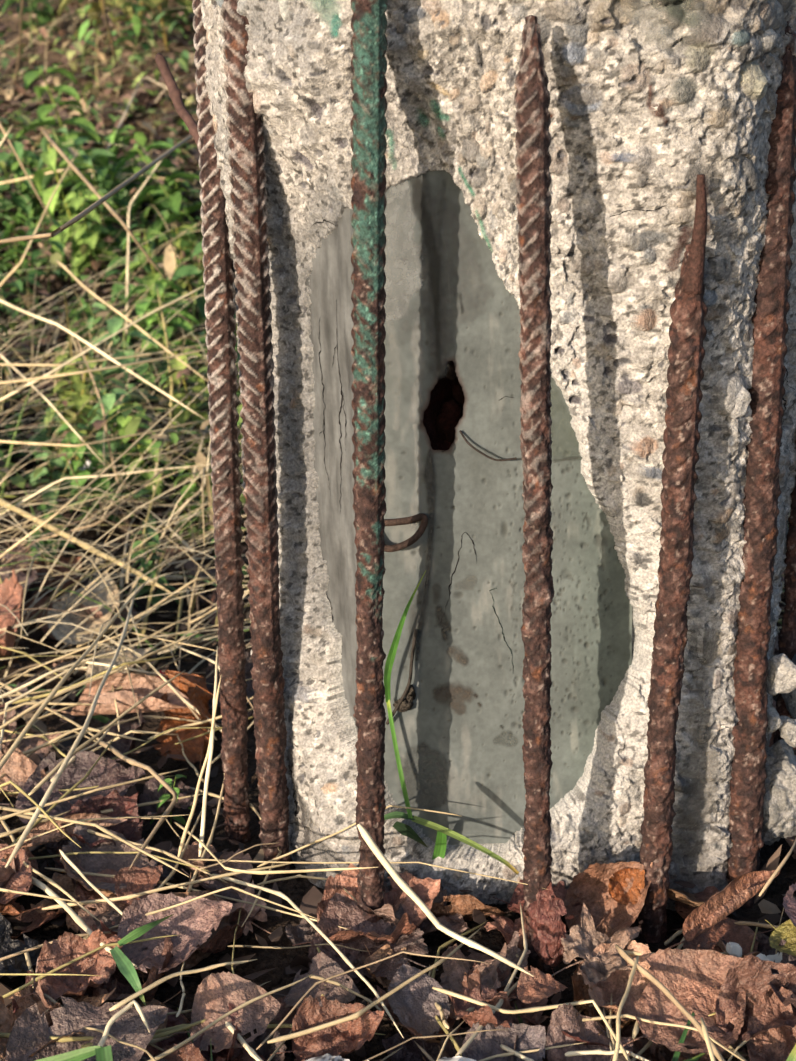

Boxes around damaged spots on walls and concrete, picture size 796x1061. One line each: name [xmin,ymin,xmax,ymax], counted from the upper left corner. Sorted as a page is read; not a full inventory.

corrosion [668,227,692,270]
spalling [298,0,632,972]
crack [440,532,477,631]